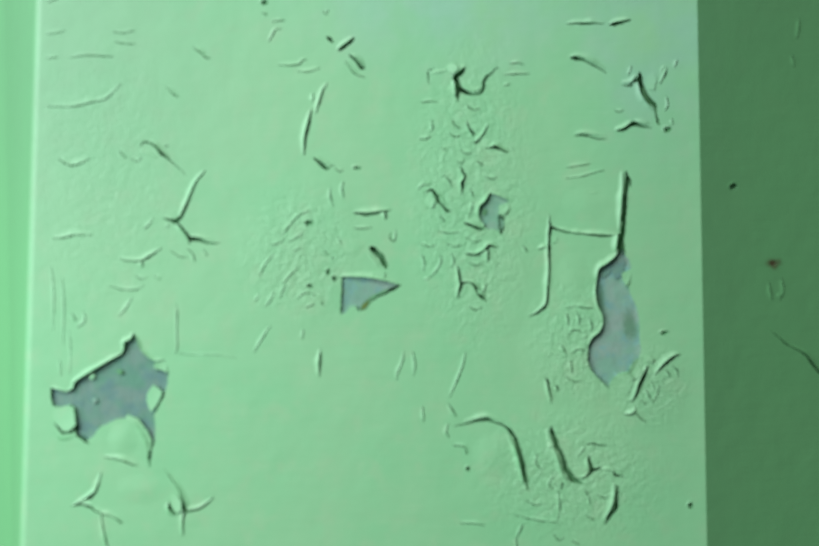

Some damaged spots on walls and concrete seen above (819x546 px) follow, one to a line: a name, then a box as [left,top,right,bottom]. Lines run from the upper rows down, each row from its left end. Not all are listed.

crack [326,36,366,70]
crack [427,63,530,102]
crack [569,51,660,140]
crack [139,139,220,244]
peeling [324,267,401,314]
crack [425,166,498,302]
peeling [474,191,511,234]
crack [528,170,631,317]
peeling [587,248,641,395]
peeling [50,332,169,467]
crack [453,411,528,491]
crack [544,426,623,525]